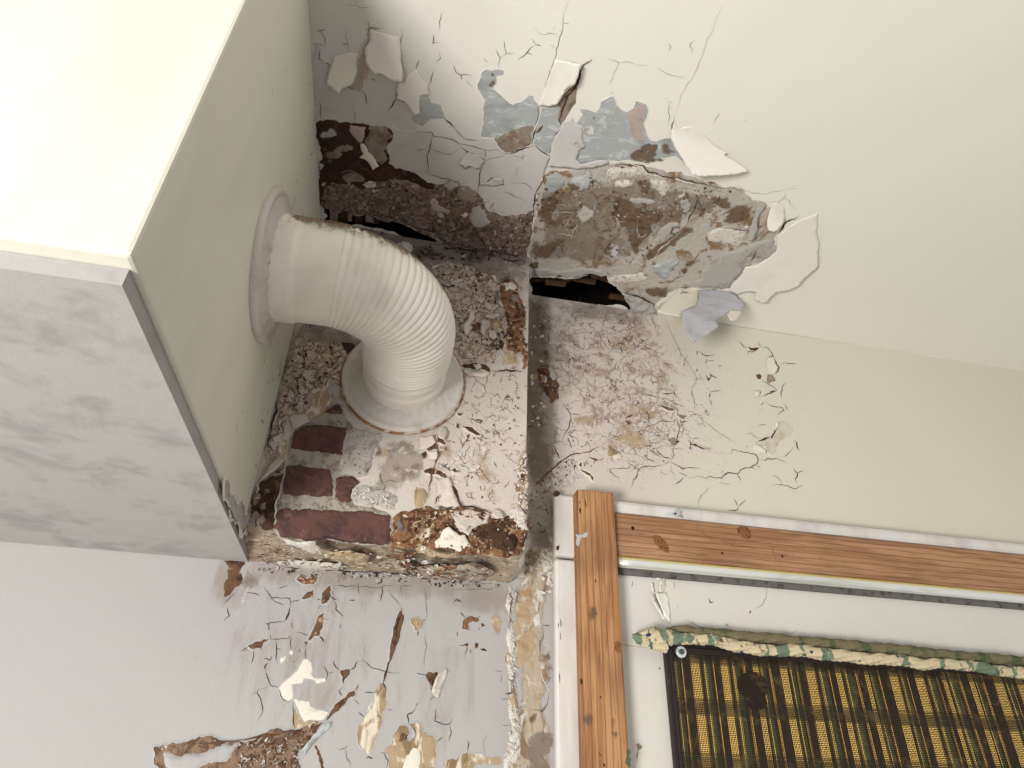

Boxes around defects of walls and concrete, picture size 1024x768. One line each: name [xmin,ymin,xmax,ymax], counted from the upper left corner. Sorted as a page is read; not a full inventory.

crack [416,0,636,257]
peeling [311,23,748,365]
flaking render [151,650,332,768]
crack [240,564,428,724]
flaking render [222,338,535,768]
corrosion [389,452,530,559]
crack [530,318,801,511]